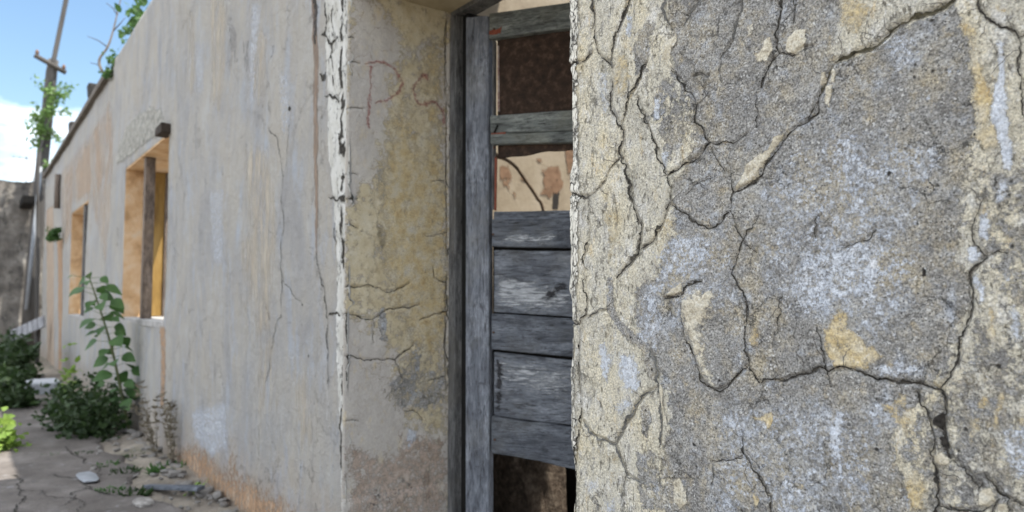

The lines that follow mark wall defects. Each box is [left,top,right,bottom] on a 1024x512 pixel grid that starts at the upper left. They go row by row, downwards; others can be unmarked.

peeling [325,0,388,493]
crack [265,0,449,467]
crack [572,0,1024,512]
spalling [598,0,1024,512]